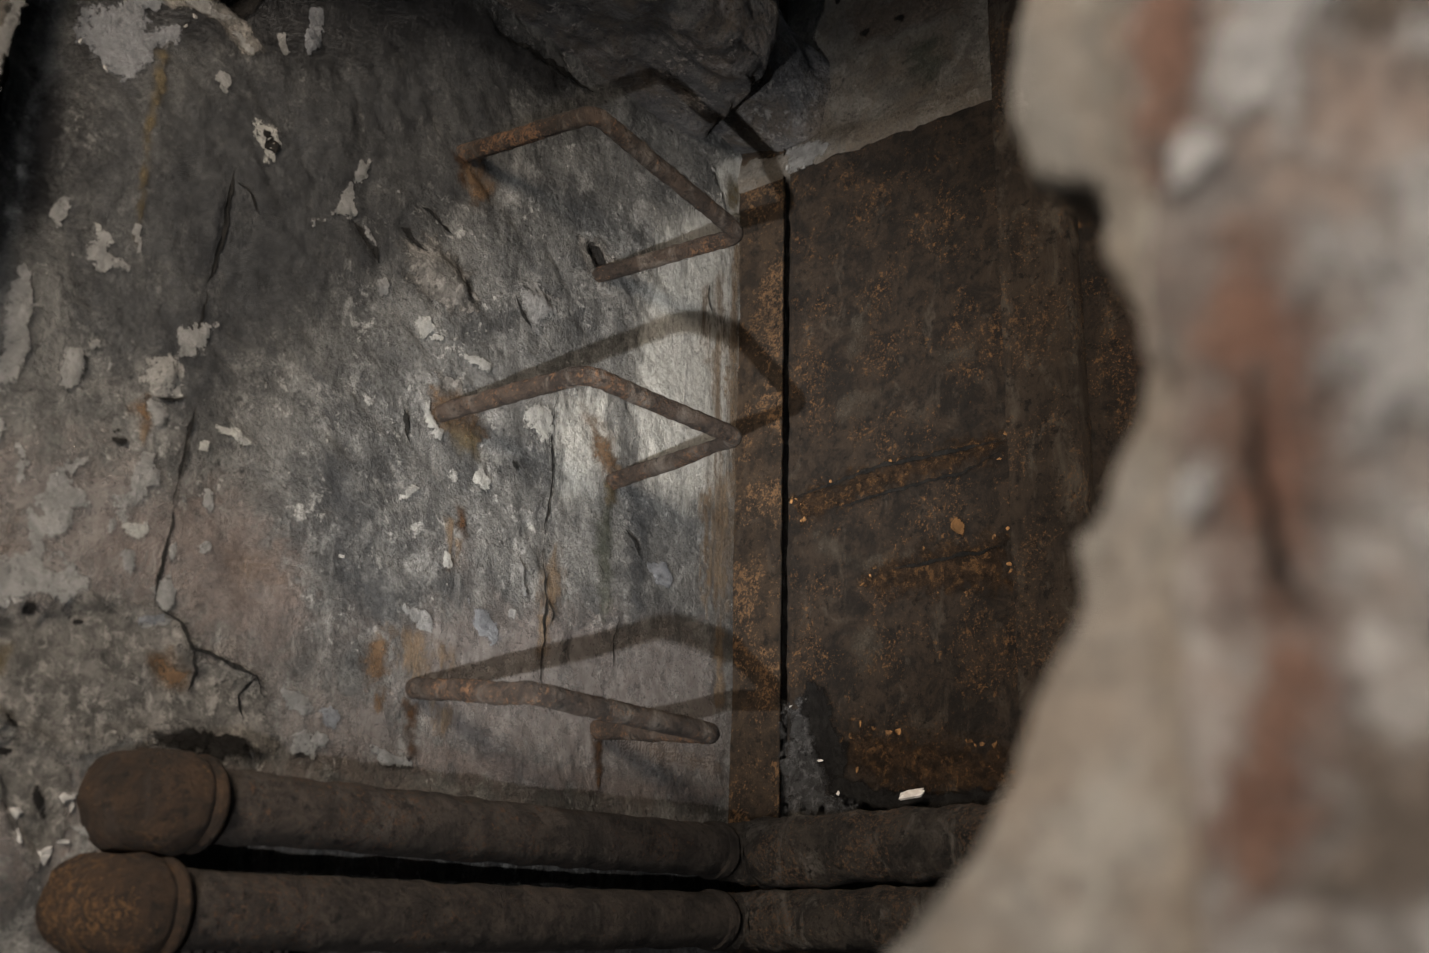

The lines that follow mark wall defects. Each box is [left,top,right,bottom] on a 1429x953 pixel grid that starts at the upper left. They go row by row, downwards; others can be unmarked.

peeling [70,0,325,82]
peeling [215,70,233,94]
rust [582,415,621,505]
crack [153,400,265,719]